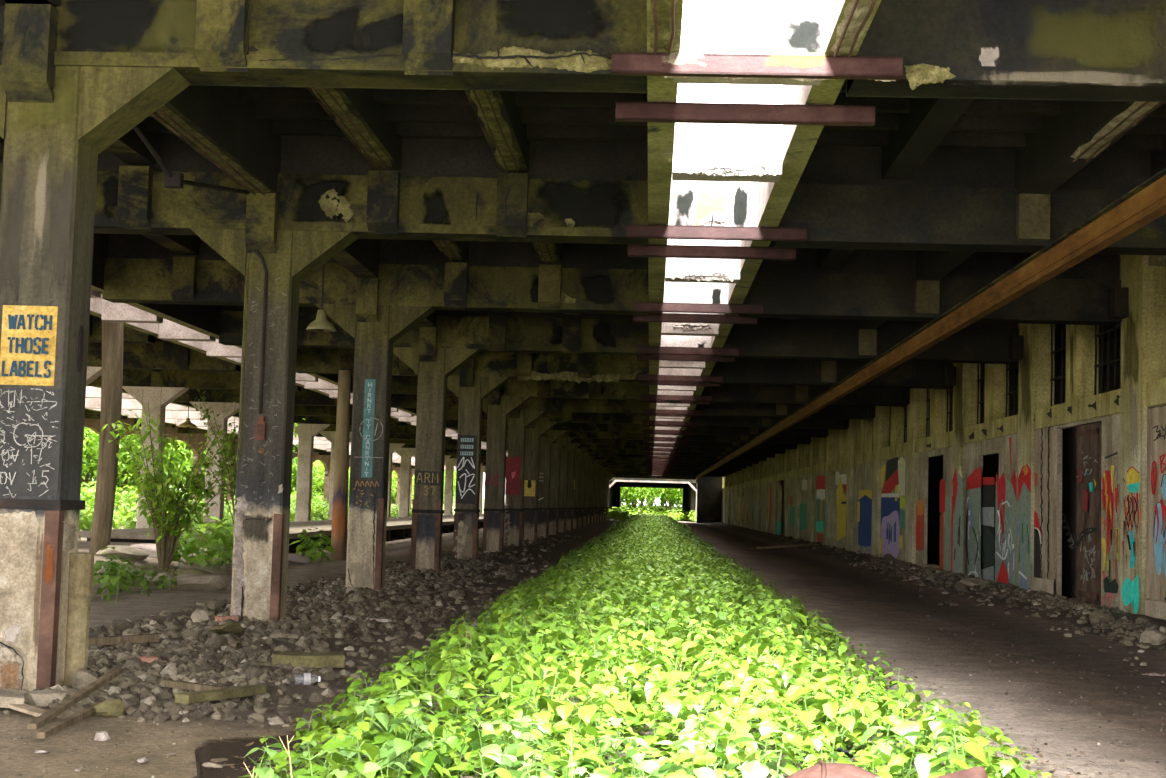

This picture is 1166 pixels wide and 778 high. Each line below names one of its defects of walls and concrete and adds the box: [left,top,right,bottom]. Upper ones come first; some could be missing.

spalling [452,46,611,73]
spalling [875,63,956,90]
peeling [318,189,354,222]
damp [675,187,748,227]
corrosion [33,534,54,653]
corrosion [1,662,20,689]